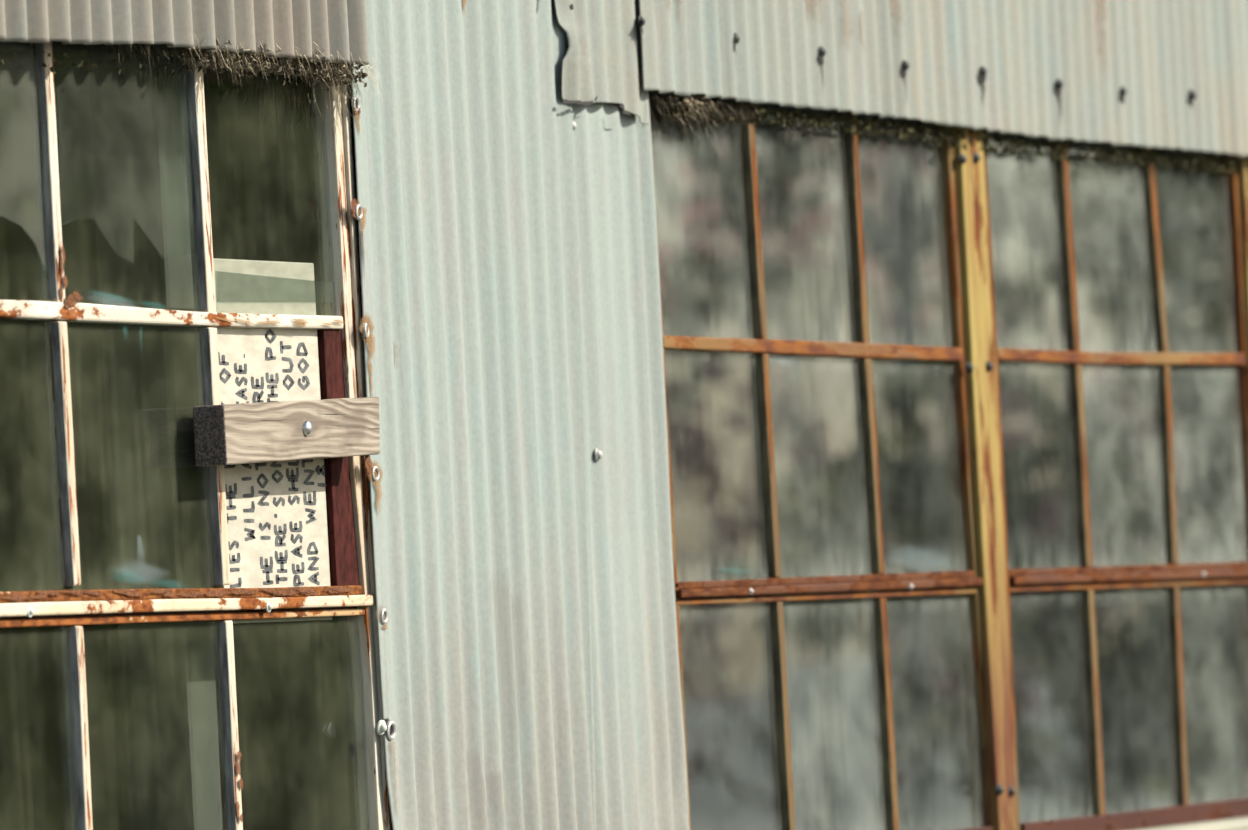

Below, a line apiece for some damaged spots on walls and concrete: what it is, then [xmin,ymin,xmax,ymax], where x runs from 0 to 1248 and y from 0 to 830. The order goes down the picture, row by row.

corrosion [60,244,83,308]
corrosion [3,586,354,602]